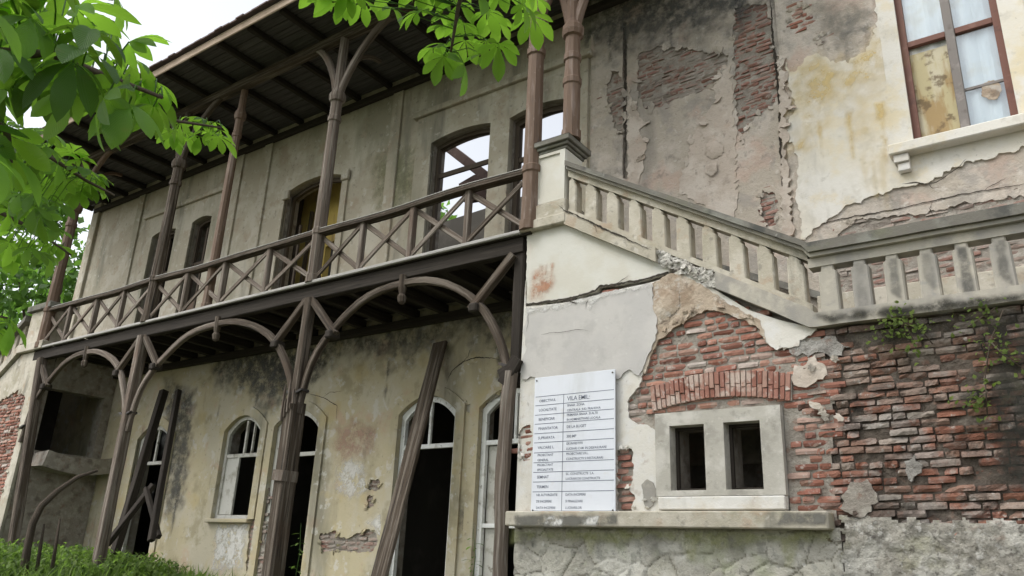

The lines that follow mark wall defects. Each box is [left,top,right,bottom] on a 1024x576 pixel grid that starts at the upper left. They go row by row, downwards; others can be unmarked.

peeling [597,4,797,237]
spalling [833,188,1024,237]
corrosion [533,273,552,293]
crack [526,272,669,334]
spalling [934,250,955,278]
water stain [214,348,297,408]
spalling [0,389,25,500]
water stain [163,386,192,507]
spalling [511,425,533,461]
spalling [616,444,658,511]
spalling [628,301,1024,544]
spalling [318,528,378,555]